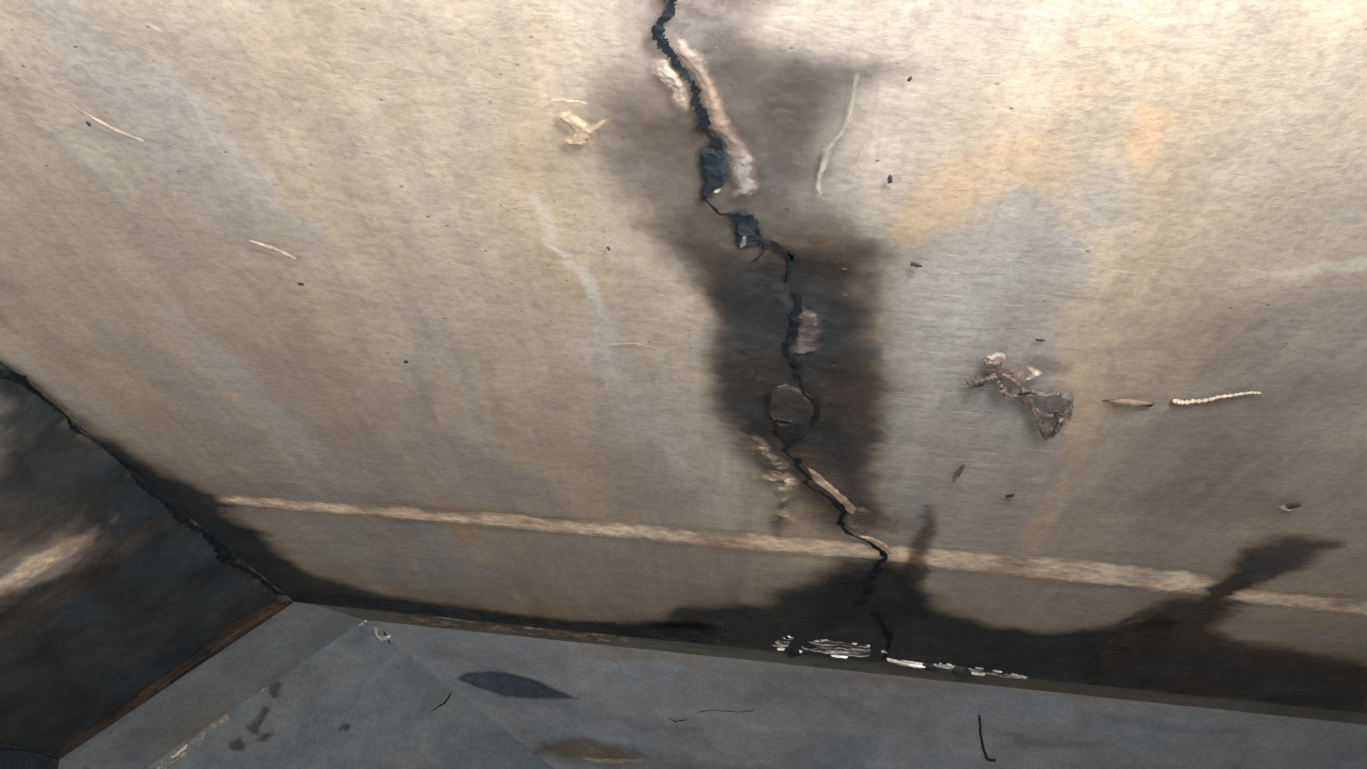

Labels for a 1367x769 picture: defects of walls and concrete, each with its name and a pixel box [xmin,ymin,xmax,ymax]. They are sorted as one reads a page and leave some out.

crack [0,369,302,603]
water stain [0,362,1367,769]
peeling [657,35,761,248]
water stain [614,0,888,533]
crack [651,0,894,660]